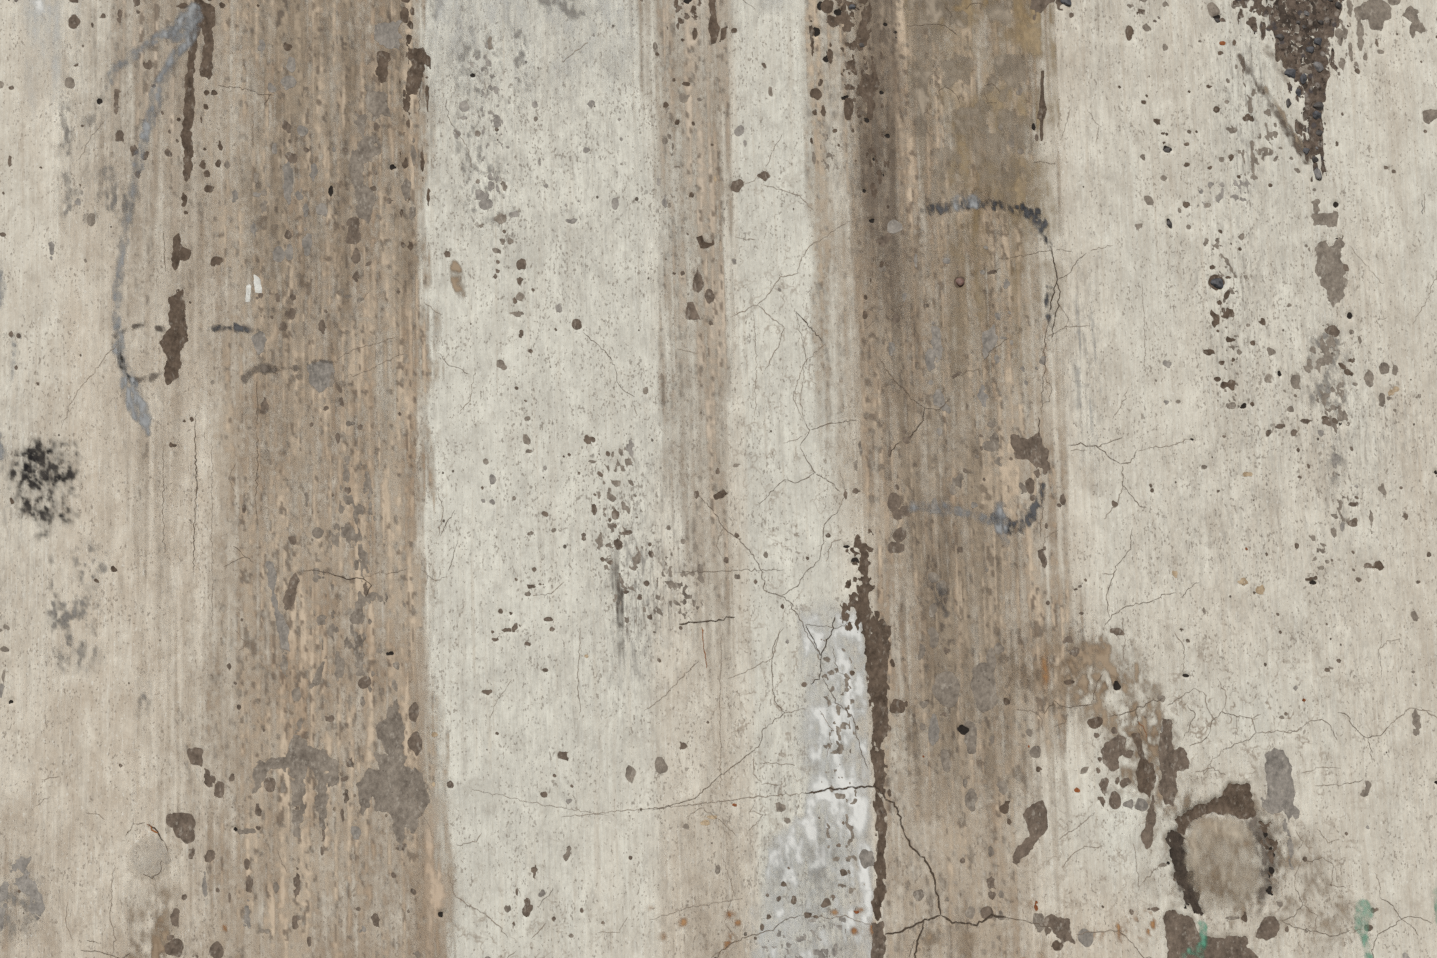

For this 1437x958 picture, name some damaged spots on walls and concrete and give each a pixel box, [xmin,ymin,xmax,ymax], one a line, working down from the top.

peeling [1125,0,1169,41]
leakage [639,0,732,608]
spalling [1166,0,1437,478]
crack [598,133,1150,958]
leakage [755,0,1260,958]
crack [1017,286,1437,786]
peeling [1295,447,1373,585]
crack [411,794,553,955]
peeling [1033,901,1093,951]
crack [1060,812,1170,886]
peeling [1074,694,1308,958]
crack [1283,830,1433,958]